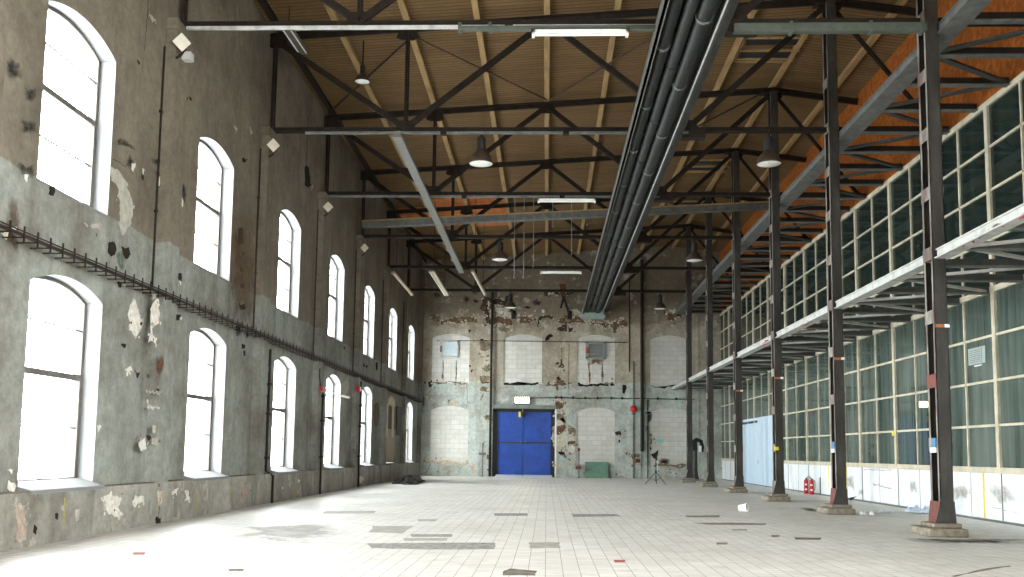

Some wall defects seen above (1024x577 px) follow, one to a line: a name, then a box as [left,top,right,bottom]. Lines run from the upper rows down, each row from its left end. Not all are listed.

peeling [108,163,144,268]
peeling [121,288,161,348]
spalling [428,296,628,401]
peeling [125,366,162,410]
peeling [136,425,161,453]
peeling [543,371,581,467]
peeling [100,491,145,525]